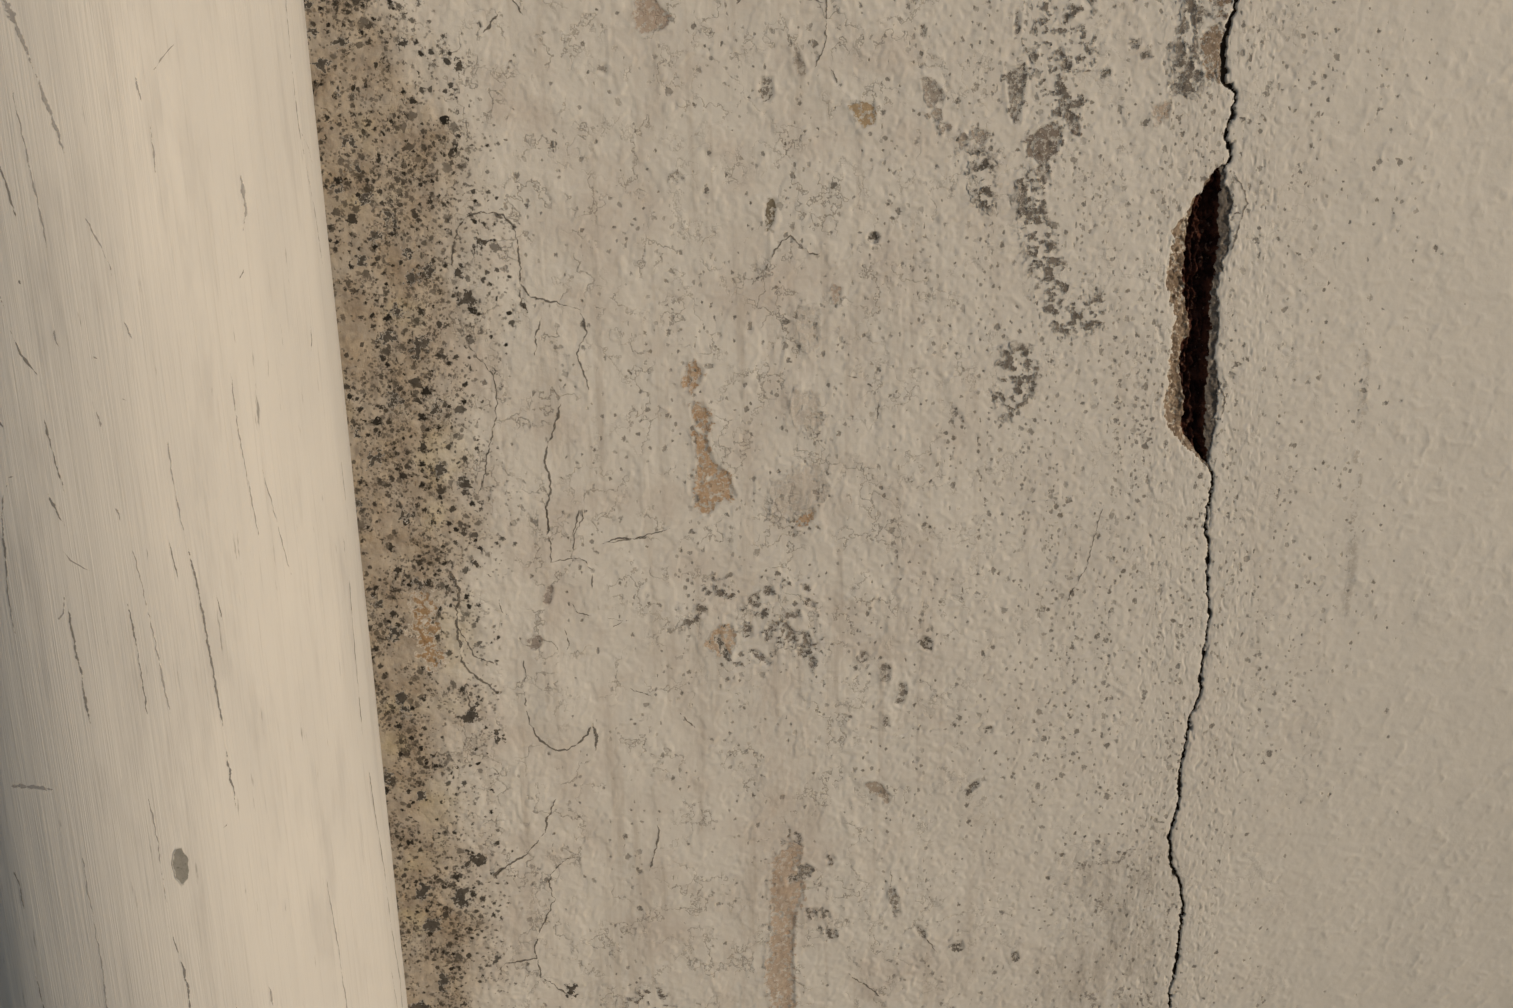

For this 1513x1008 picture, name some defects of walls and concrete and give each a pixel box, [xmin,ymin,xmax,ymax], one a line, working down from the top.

peeling [631,0,673,34]
crack [1219,0,1248,249]
water stain [304,0,591,1008]
peeling [681,358,735,520]
spalling [1163,166,1233,467]
crack [1167,459,1214,1008]
peeling [762,833,839,1008]